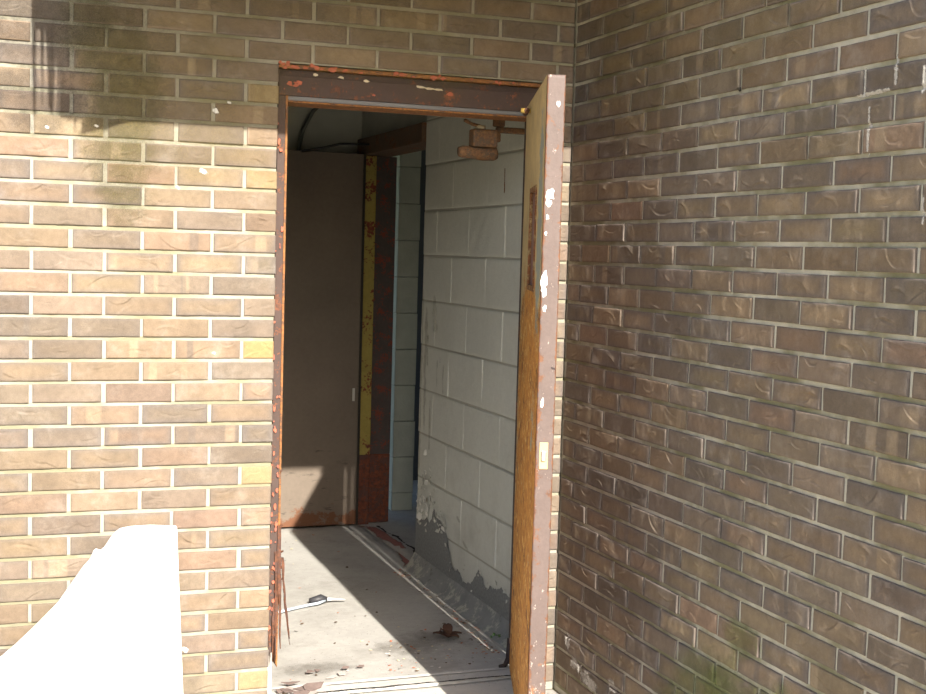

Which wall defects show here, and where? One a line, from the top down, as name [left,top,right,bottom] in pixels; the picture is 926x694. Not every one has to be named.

corrosion [271,526,290,661]
peeling [415,467,510,621]